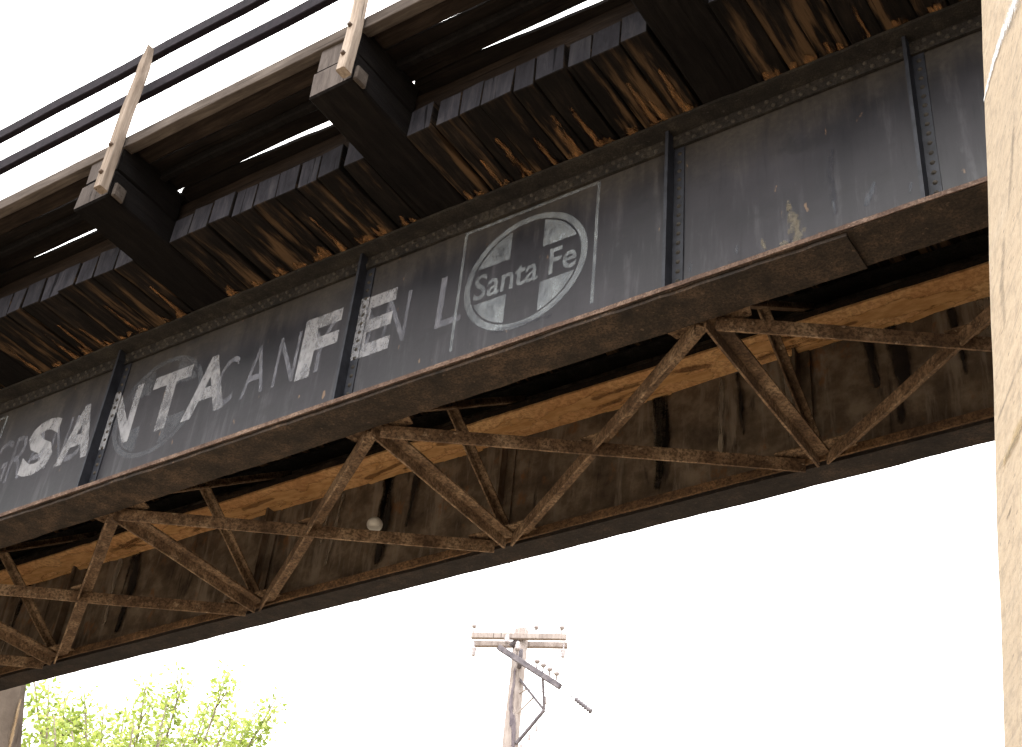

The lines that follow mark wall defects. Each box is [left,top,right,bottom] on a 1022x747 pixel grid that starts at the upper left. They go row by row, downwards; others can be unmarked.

corrosion [830,288,977,329]
corrosion [58,316,147,359]
corrosion [782,336,837,355]
corrosion [644,349,732,403]
leakage [652,394,670,448]
leakage [735,373,745,435]
corrosion [352,460,412,484]
corrosion [223,477,333,519]
corrosion [103,537,148,564]